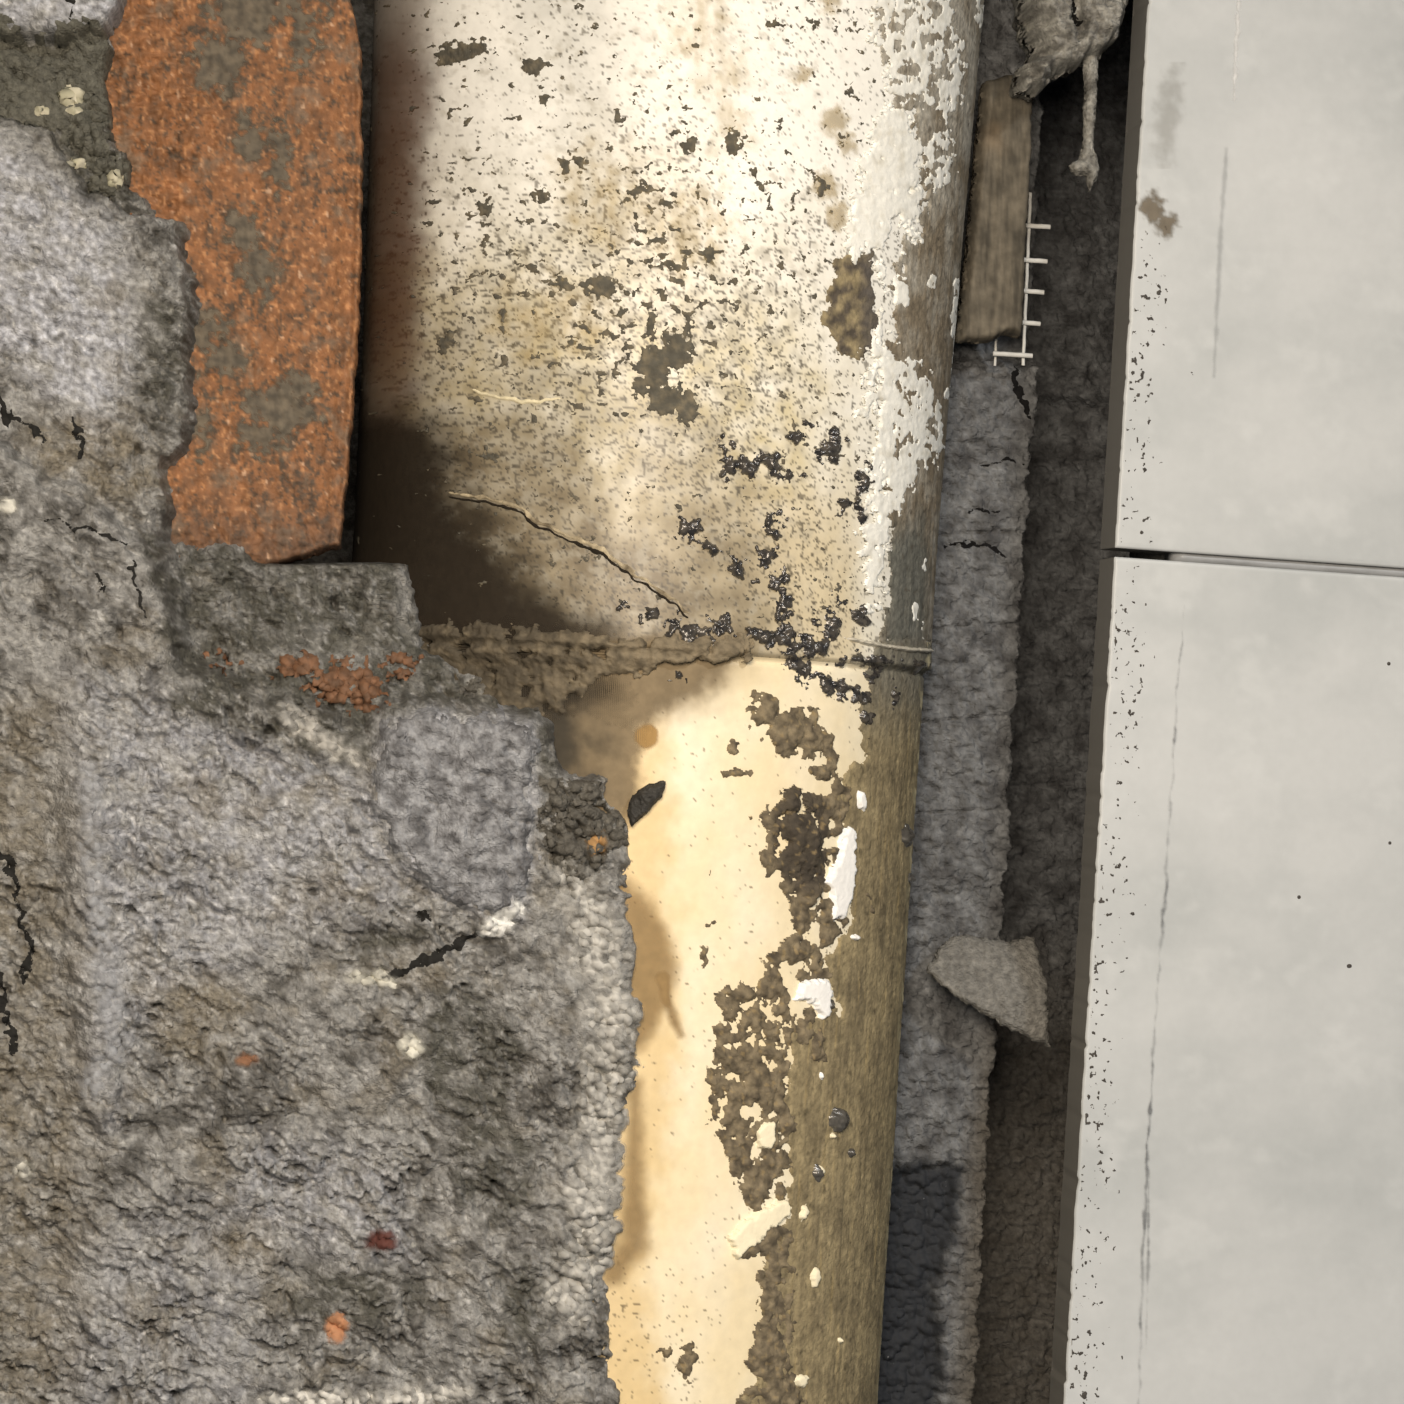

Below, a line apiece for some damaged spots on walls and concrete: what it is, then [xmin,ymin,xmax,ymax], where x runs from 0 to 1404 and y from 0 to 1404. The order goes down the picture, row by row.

peeling [820,0,984,614]
crack [472,389,560,404]
damp [352,416,600,659]
crack [448,491,689,618]
peeling [857,791,867,812]
peeling [825,826,857,921]
peeling [792,978,833,1020]
peeling [756,1121,776,1149]
peeling [727,1200,809,1260]
peeling [810,1267,821,1288]
peeling [794,1374,809,1388]